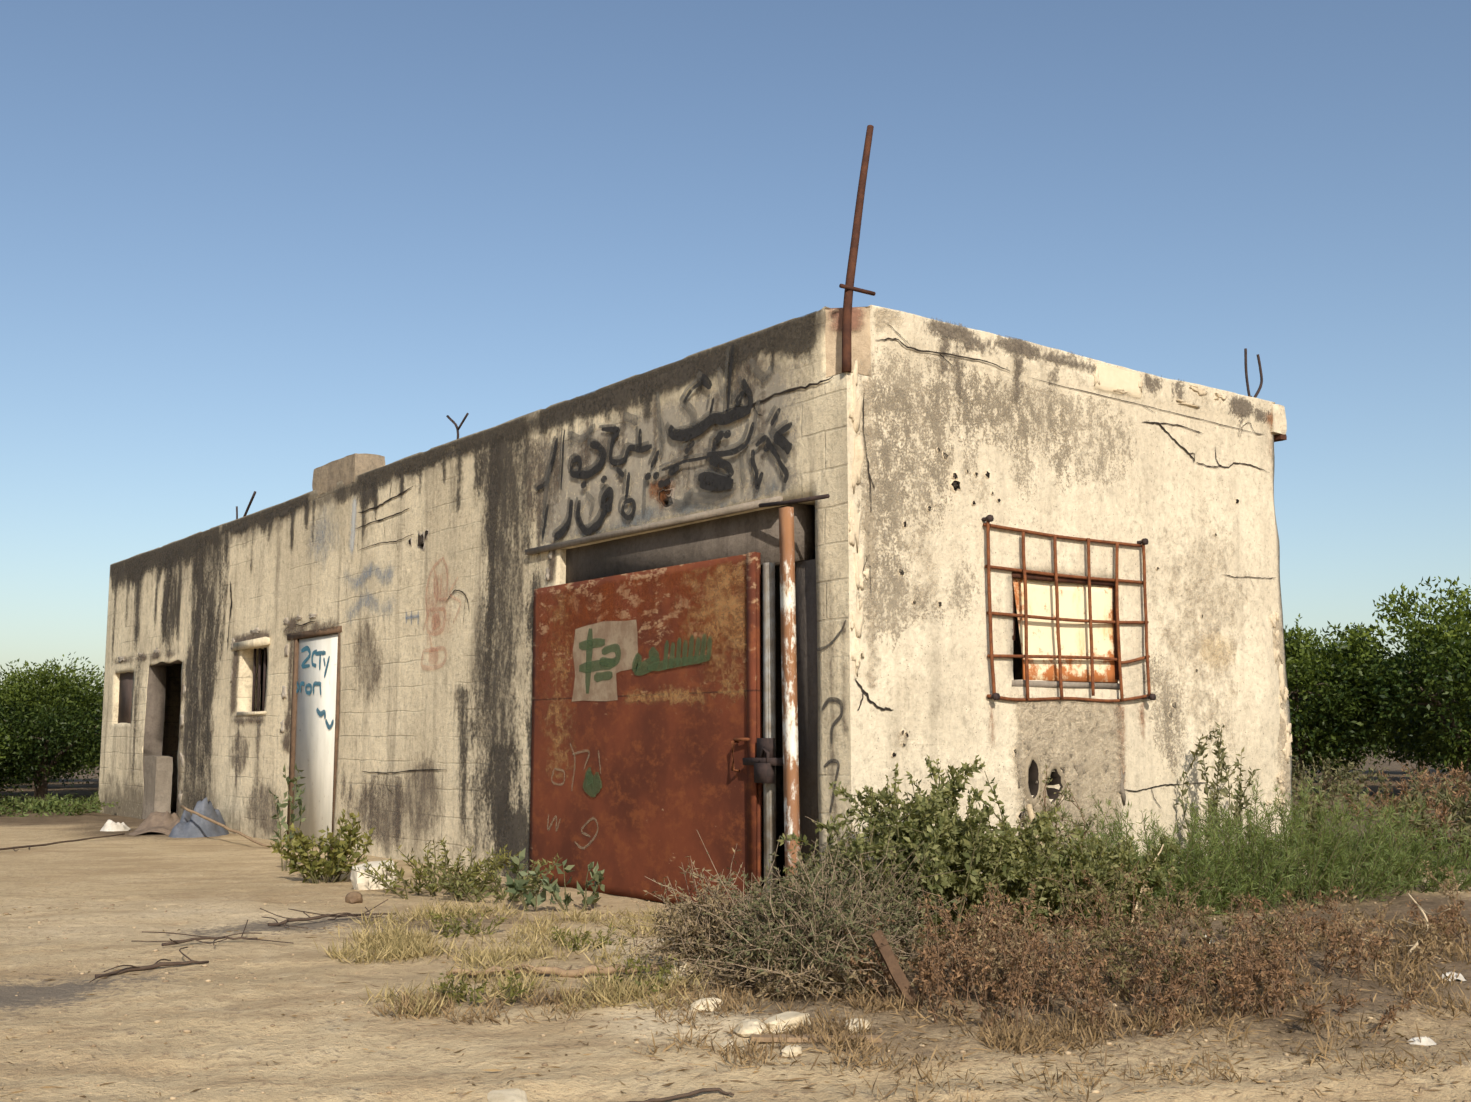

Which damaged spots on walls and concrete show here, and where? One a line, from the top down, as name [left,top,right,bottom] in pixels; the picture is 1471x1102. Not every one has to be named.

crack [355,483,413,550]
damp [857,319,1137,650]
crack [878,325,1270,473]
damp [1144,373,1184,400]
flaking render [1176,385,1227,407]
damp [1228,396,1271,436]
damp [111,494,315,811]
damp [334,311,817,879]
rust [626,563,747,704]
crack [855,678,892,711]
damp [231,722,278,828]
spalling [1012,696,1126,862]